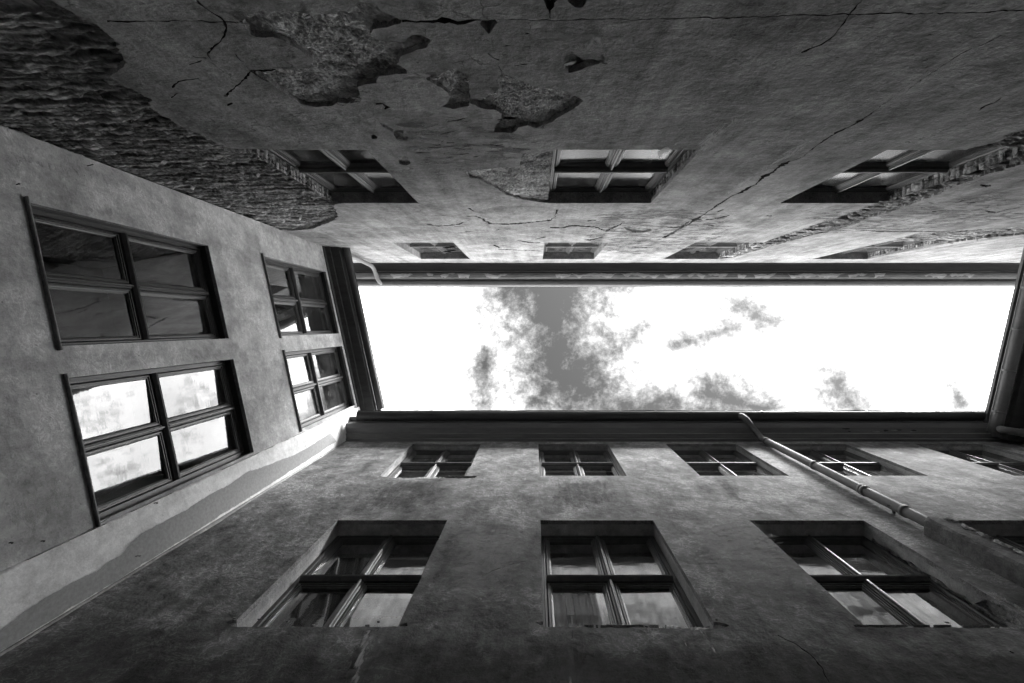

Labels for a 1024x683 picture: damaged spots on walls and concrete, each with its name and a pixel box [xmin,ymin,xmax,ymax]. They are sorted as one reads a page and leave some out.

crack [107,0,276,106]
flaking render [236,0,428,106]
crack [402,0,1024,53]
flaking render [0,0,342,229]
flaking render [376,69,537,167]
crack [427,208,622,251]
crack [636,37,1020,248]
flaking render [720,130,1024,257]